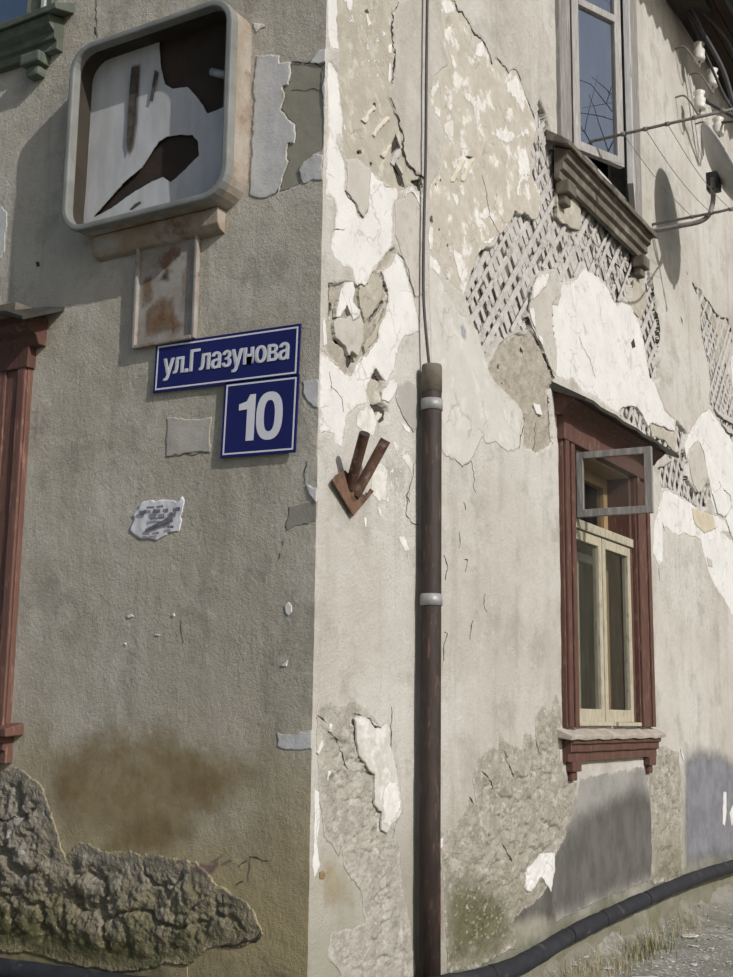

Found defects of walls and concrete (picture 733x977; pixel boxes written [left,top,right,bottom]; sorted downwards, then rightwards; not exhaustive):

peeling [249,0,675,493]
peeling [371,441,413,566]
peeling [653,408,733,644]
flaking render [0,767,263,972]
flaking render [312,696,416,977]
flaking render [441,694,580,973]
flaking render [647,744,684,885]